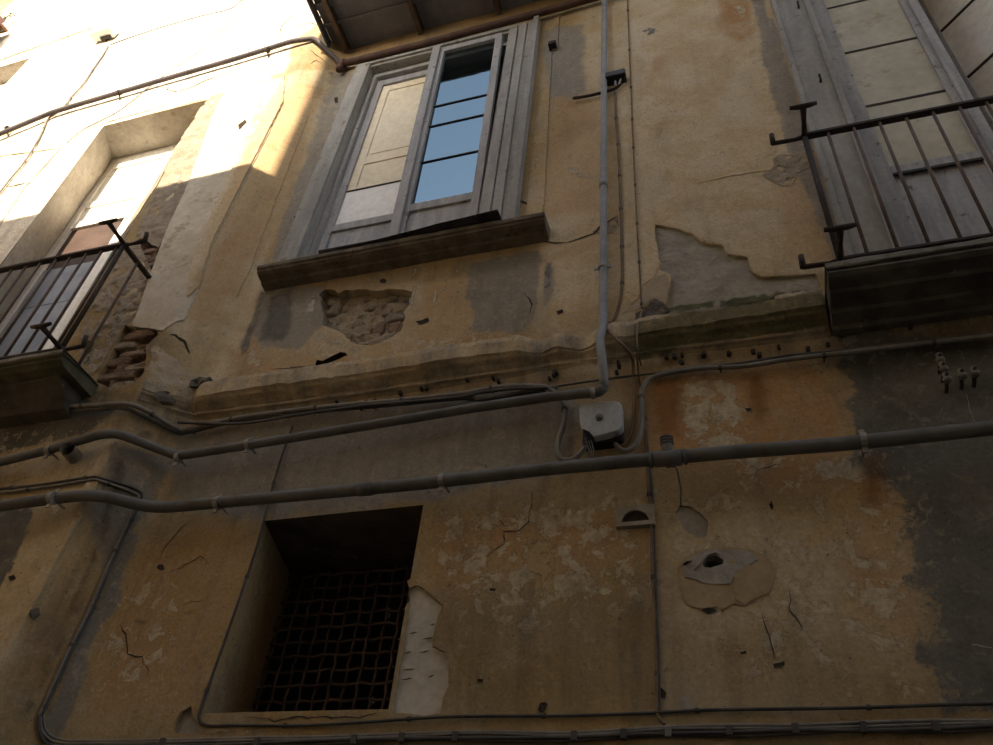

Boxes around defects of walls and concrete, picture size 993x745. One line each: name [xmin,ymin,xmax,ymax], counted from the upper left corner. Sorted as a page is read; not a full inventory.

flaking render [80,93,225,406]
spalling [315,352,348,365]
flaking render [305,278,429,345]
flaking render [626,219,825,320]
spalling [702,556,723,567]
flaking render [392,580,456,716]